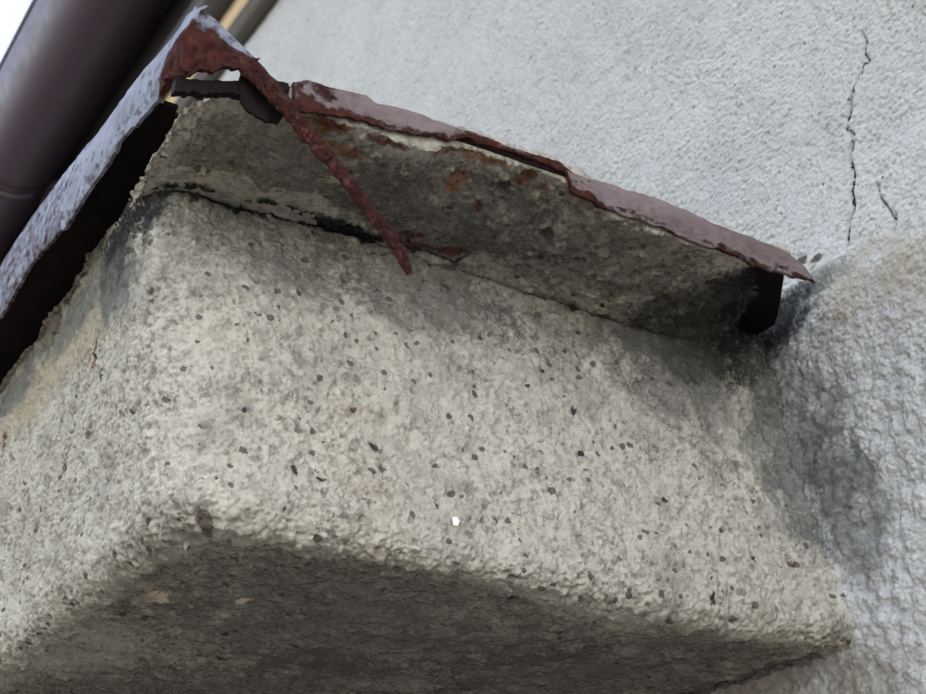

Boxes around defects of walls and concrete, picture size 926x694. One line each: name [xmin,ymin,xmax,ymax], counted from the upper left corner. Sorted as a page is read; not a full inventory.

rust [303,116,362,158]
rust [366,134,410,151]
rust [514,169,548,193]
crack [846,33,871,242]
crack [126,182,471,264]
damp [527,267,887,569]